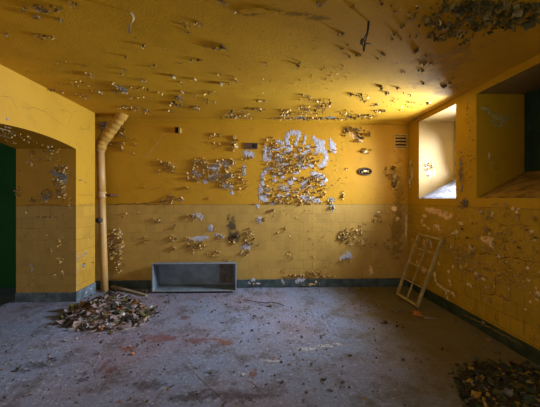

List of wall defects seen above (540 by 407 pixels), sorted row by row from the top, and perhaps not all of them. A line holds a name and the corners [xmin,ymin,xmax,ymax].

peeling [375,0,540,48]
peeling [220,100,267,119]
peeling [272,85,395,121]
peeling [343,127,372,154]
peeling [0,117,71,214]
peeling [186,136,255,195]
peeling [255,130,347,214]
peeling [107,228,126,273]
peeling [185,224,260,261]
peeling [338,223,392,262]
peeling [391,202,540,310]